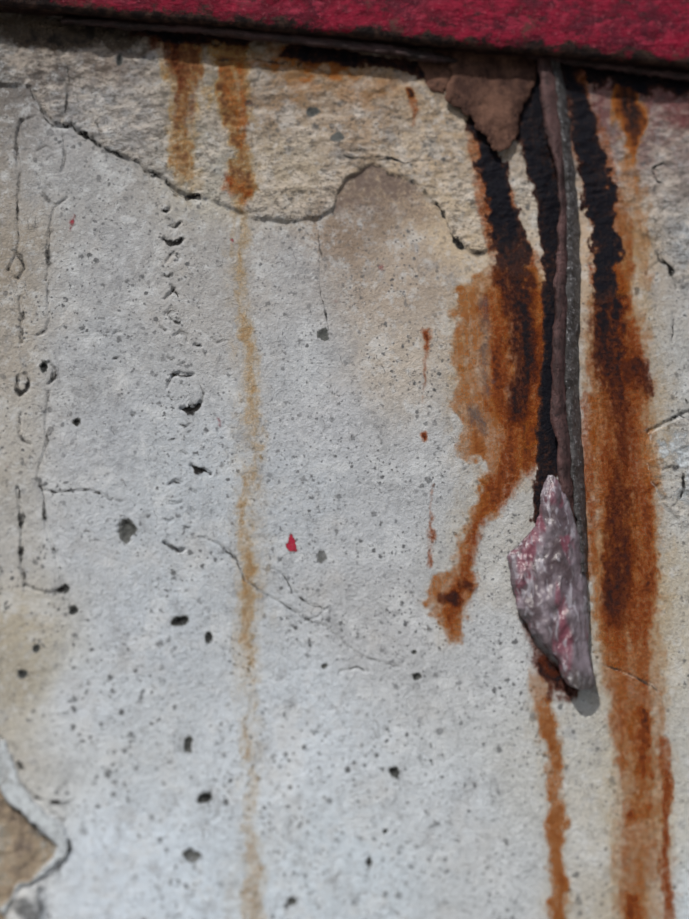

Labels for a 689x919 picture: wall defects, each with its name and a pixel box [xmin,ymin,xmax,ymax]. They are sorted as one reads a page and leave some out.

crack [29,68,201,200]
corrosion [151,38,358,205]
crack [343,148,417,164]
peeling [334,164,464,250]
corrosion [405,87,417,116]
corrosion [611,85,648,195]
corrosion [423,256,545,642]
peeling [418,50,596,690]
corrosion [581,278,674,919]
spalling [0,738,74,919]
corrosion [522,618,579,919]